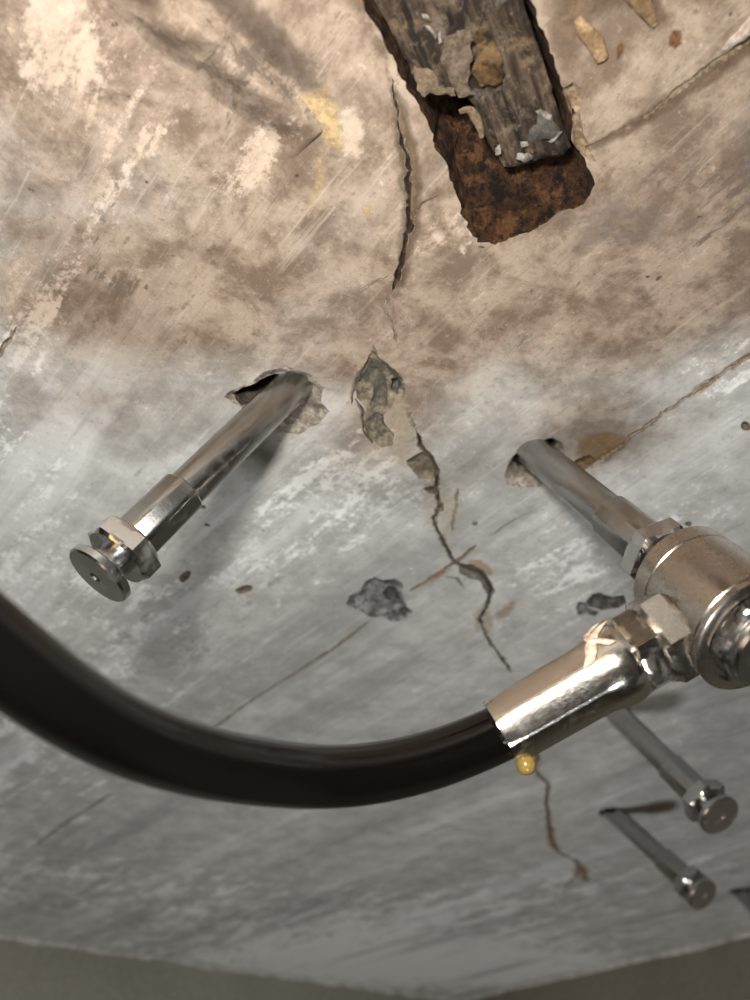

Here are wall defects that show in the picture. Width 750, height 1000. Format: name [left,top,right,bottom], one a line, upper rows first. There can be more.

water stain [91,85,144,162]
water stain [208,0,364,158]
spalling [362,0,596,245]
water stain [552,0,616,59]
crack [585,37,750,147]
water stain [592,40,750,148]
crack [350,78,438,343]
spalling [224,367,329,435]
spalling [351,342,407,447]
crack [591,353,750,467]
crack [407,409,532,672]
spalling [346,577,412,622]